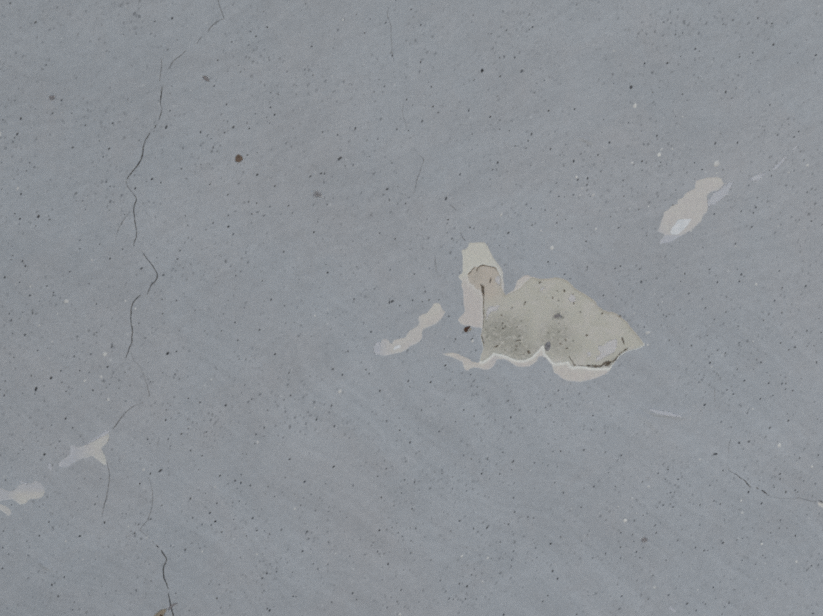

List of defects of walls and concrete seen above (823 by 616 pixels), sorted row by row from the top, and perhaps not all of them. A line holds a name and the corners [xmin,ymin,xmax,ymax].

crack [107,0,224,443]
peeling [658,177,733,244]
peeling [374,303,445,356]
spalling [444,242,645,382]
peeling [48,430,110,470]
peeling [0,480,45,516]
crack [140,480,174,616]